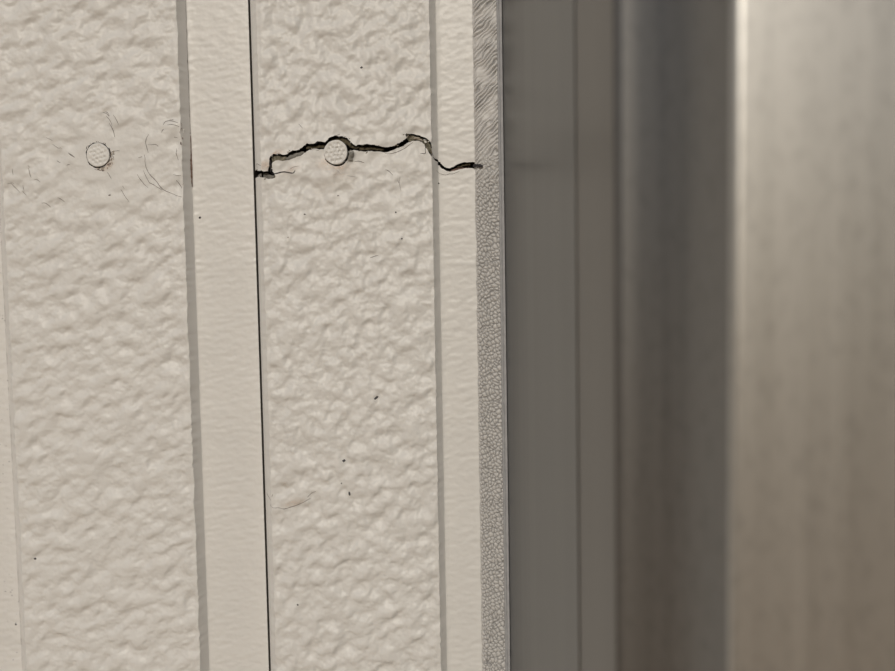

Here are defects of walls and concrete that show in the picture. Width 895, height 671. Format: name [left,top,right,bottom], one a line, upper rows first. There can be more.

crack [256,133,505,671]